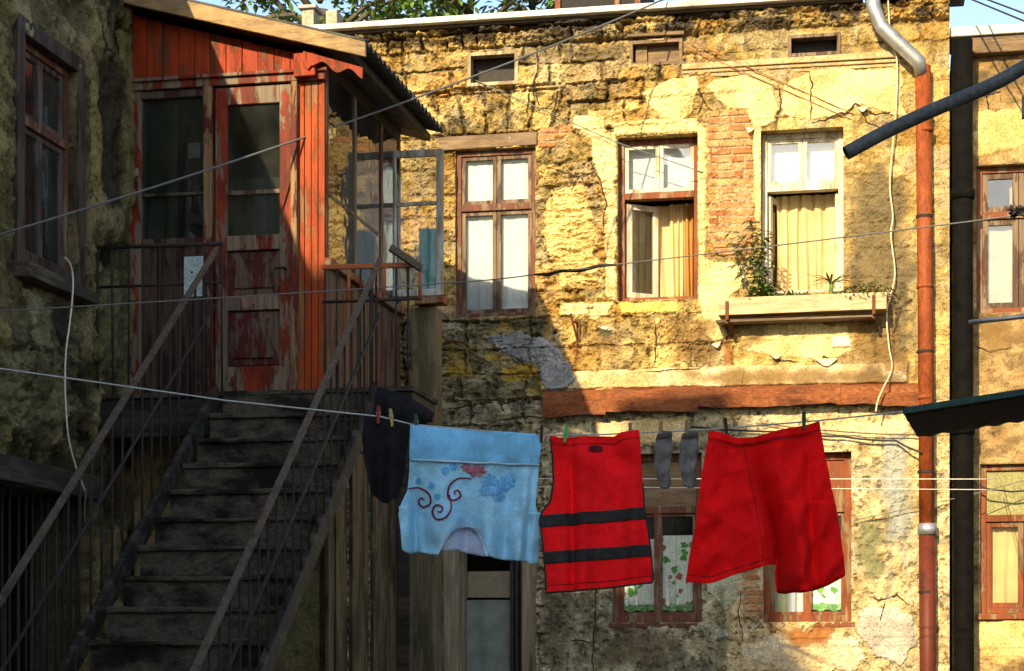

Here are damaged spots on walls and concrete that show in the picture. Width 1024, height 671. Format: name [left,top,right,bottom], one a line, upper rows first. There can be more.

crack [697,89,713,116]
crack [809,71,890,127]
flaking render [537,68,907,366]
spalling [484,354,538,383]